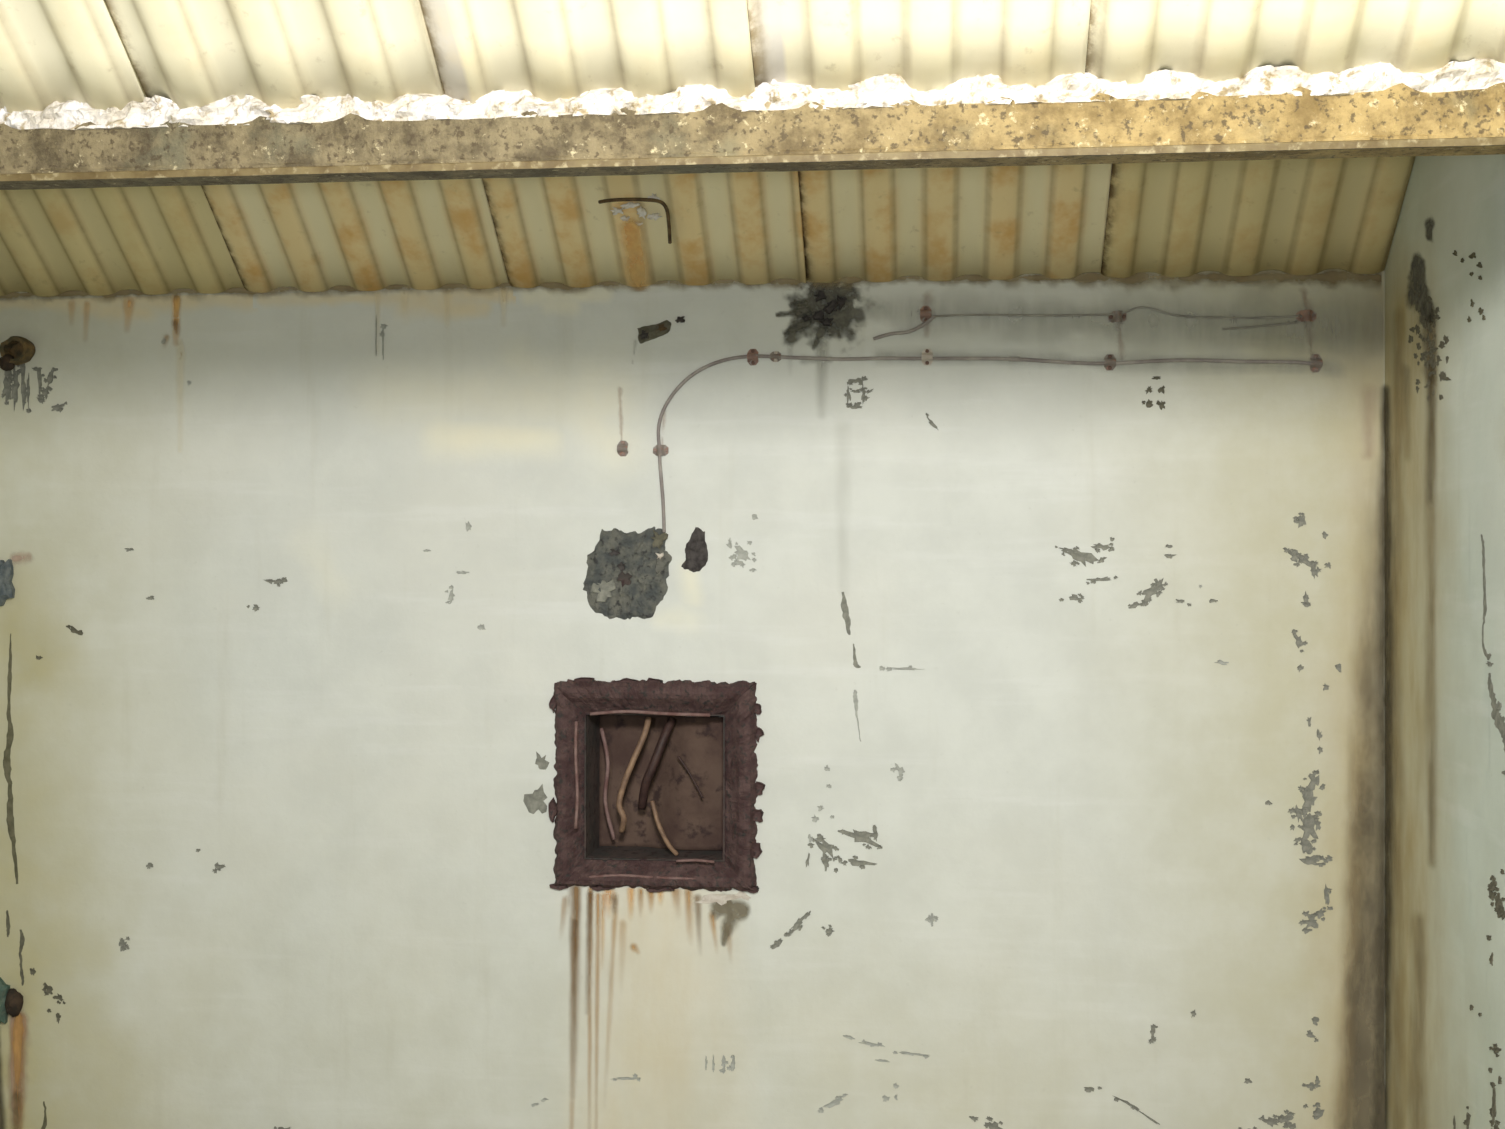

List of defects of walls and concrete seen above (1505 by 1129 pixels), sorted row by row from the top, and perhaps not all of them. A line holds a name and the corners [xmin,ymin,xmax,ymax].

spalling [583,527,708,620]
peeling [726,539,756,572]
peeling [1055,537,1118,603]
peeling [1128,578,1191,609]
peeling [1283,547,1332,607]
leakage [1270,219,1505,1129]
crack [1481,534,1505,775]
peeling [805,805,882,873]
peeling [1288,717,1333,934]
corrosion [536,885,767,1129]
corrosion [10,1013,26,1113]
peeling [1488,1044,1502,1129]